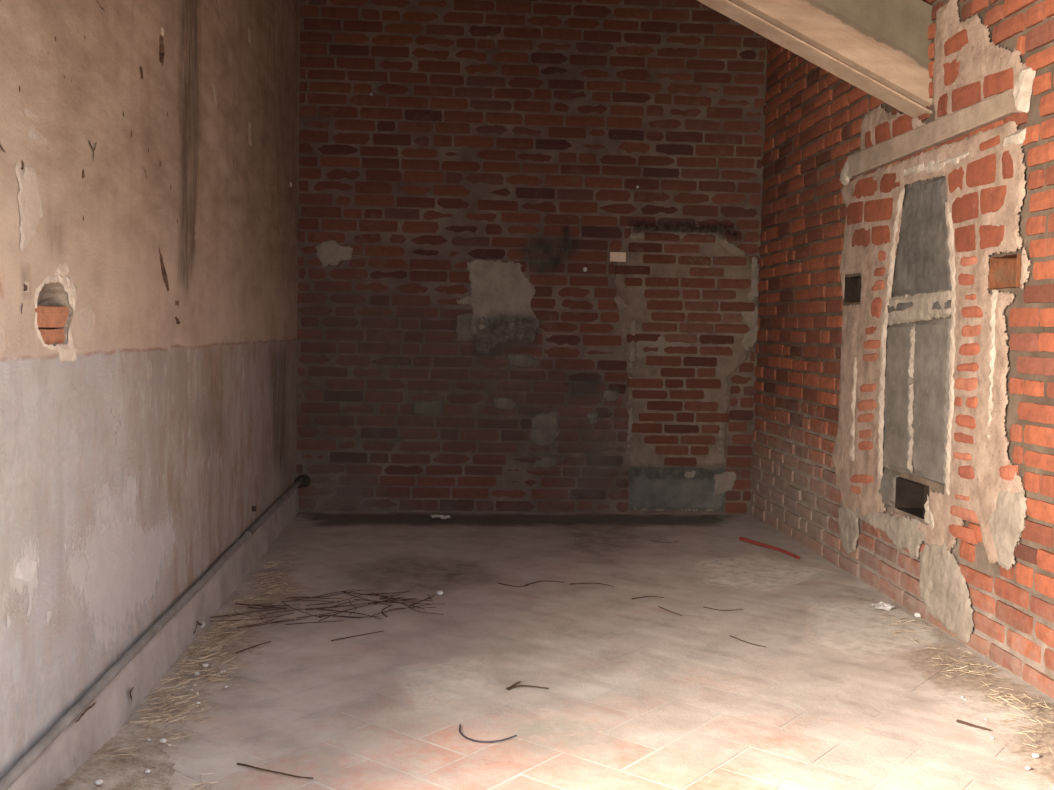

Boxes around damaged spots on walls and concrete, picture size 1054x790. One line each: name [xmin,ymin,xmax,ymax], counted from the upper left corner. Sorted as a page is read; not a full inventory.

water stain [181,0,198,286]
peeling [15,159,43,252]
flaking render [35,306,69,345]